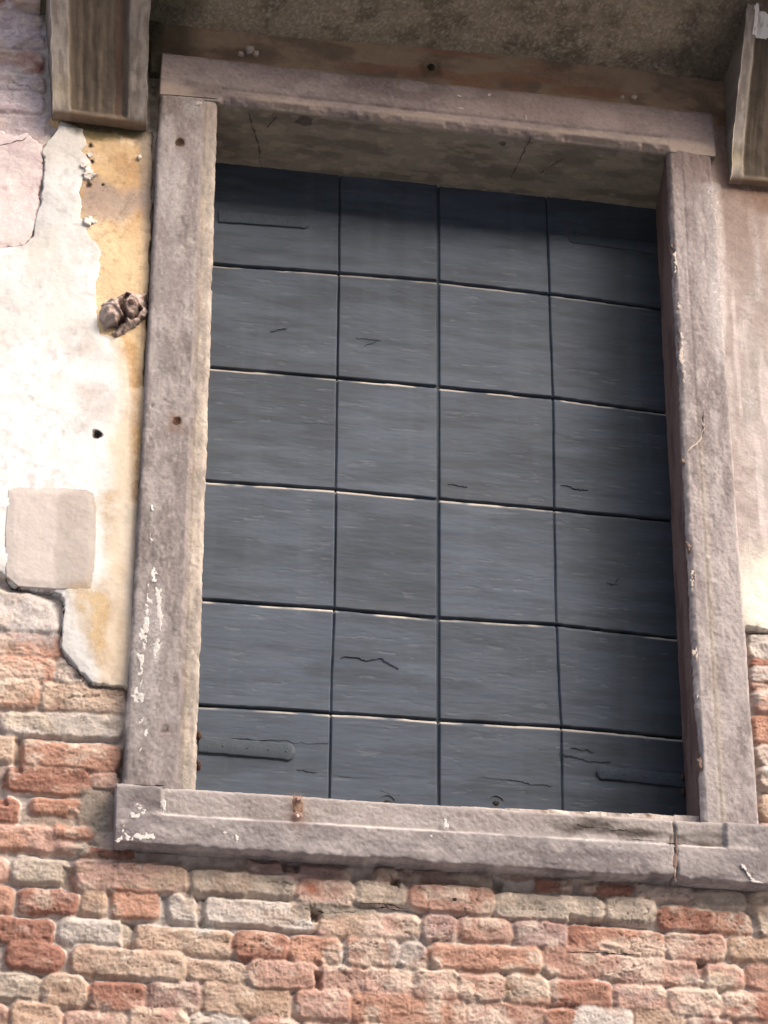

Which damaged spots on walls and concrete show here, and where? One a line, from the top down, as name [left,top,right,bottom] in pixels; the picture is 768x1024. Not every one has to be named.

peeling [0,130,44,249]
peeling [48,118,154,389]
peeling [131,567,164,703]
crack [577,824,685,882]